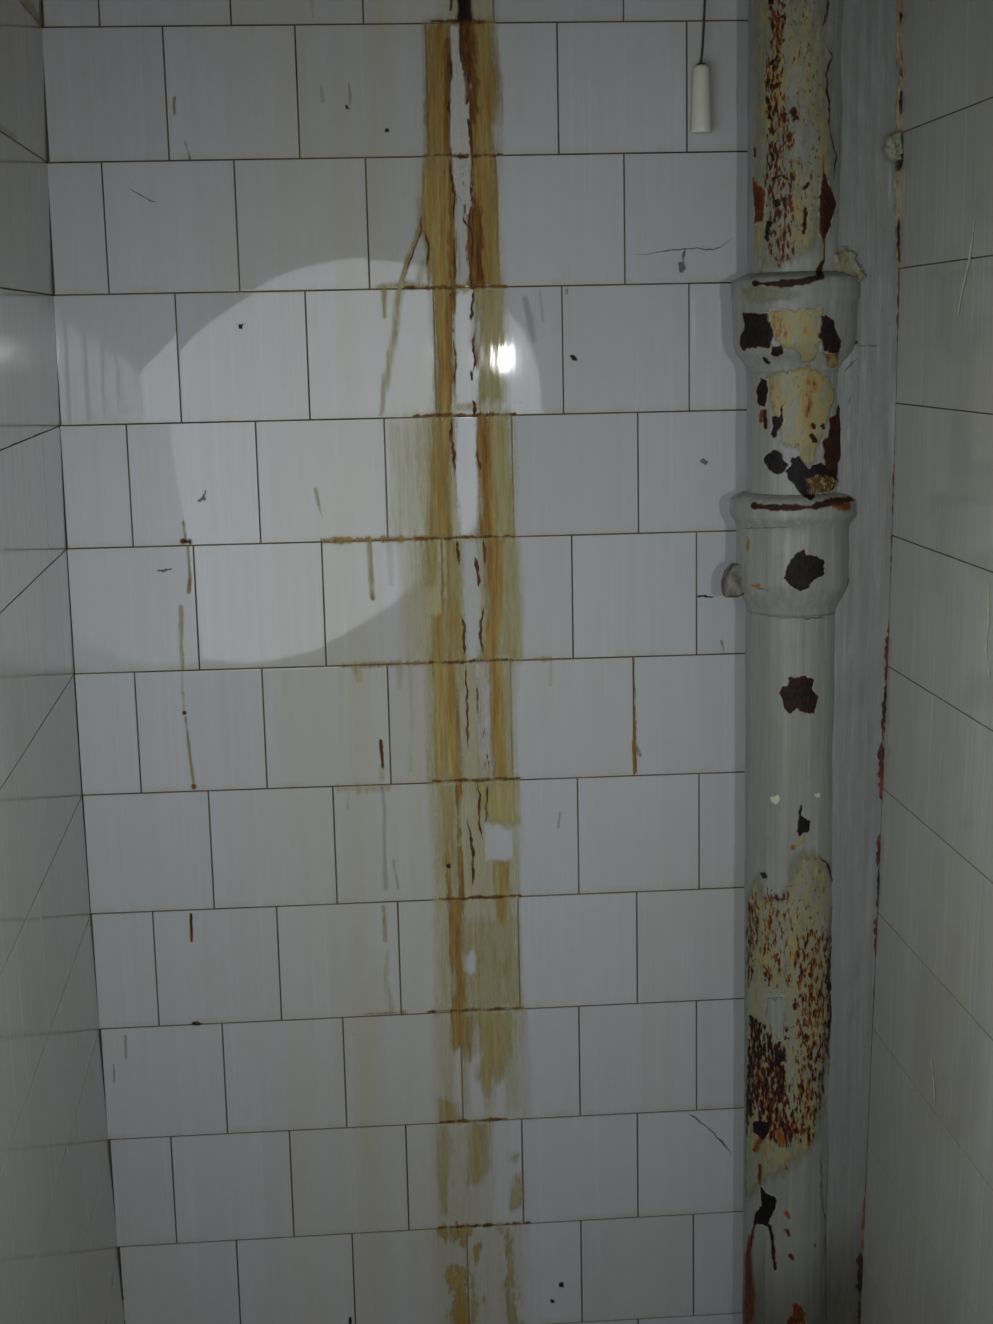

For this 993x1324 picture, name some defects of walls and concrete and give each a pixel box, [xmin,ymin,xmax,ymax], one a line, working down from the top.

peeling [739,0,858,501]
rust [180,521,191,593]
rust [321,0,522,1092]
spalling [784,549,826,591]
spalling [777,674,818,714]
rust [182,711,196,789]
rust [437,1085,531,1324]
rust [744,1236,756,1324]